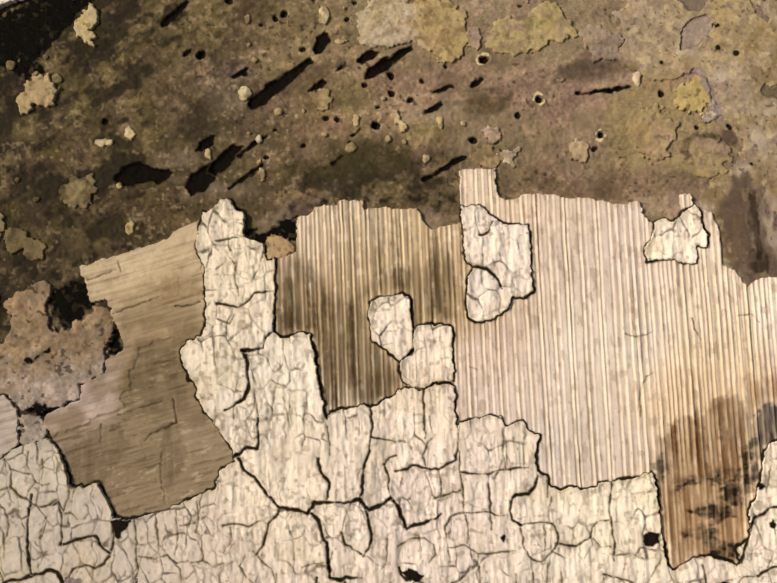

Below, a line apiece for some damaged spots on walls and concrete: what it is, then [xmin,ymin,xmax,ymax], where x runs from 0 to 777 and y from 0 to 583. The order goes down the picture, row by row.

peeling [0,156,777,583]
crack [140,398,178,441]
crack [223,332,660,583]
leakage [755,406,777,449]
crack [0,451,114,583]
crack [134,504,209,583]
crack [702,506,777,583]